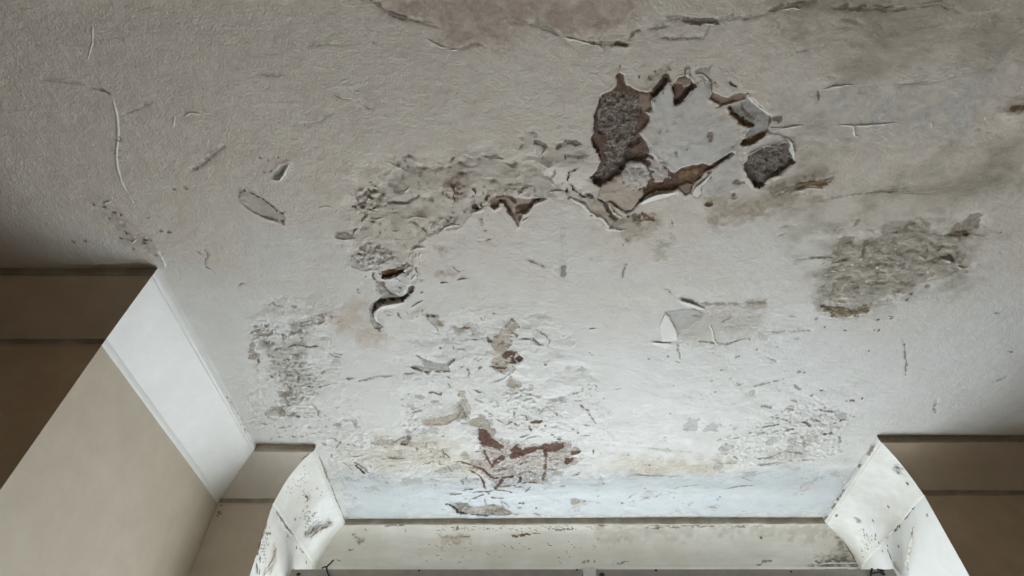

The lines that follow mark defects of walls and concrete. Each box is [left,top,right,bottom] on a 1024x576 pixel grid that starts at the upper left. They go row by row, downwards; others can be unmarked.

peeling [238,190,284,225]
peeling [248,65,826,507]
rust [452,419,594,516]
peeling [570,496,599,511]
peeling [683,360,863,495]